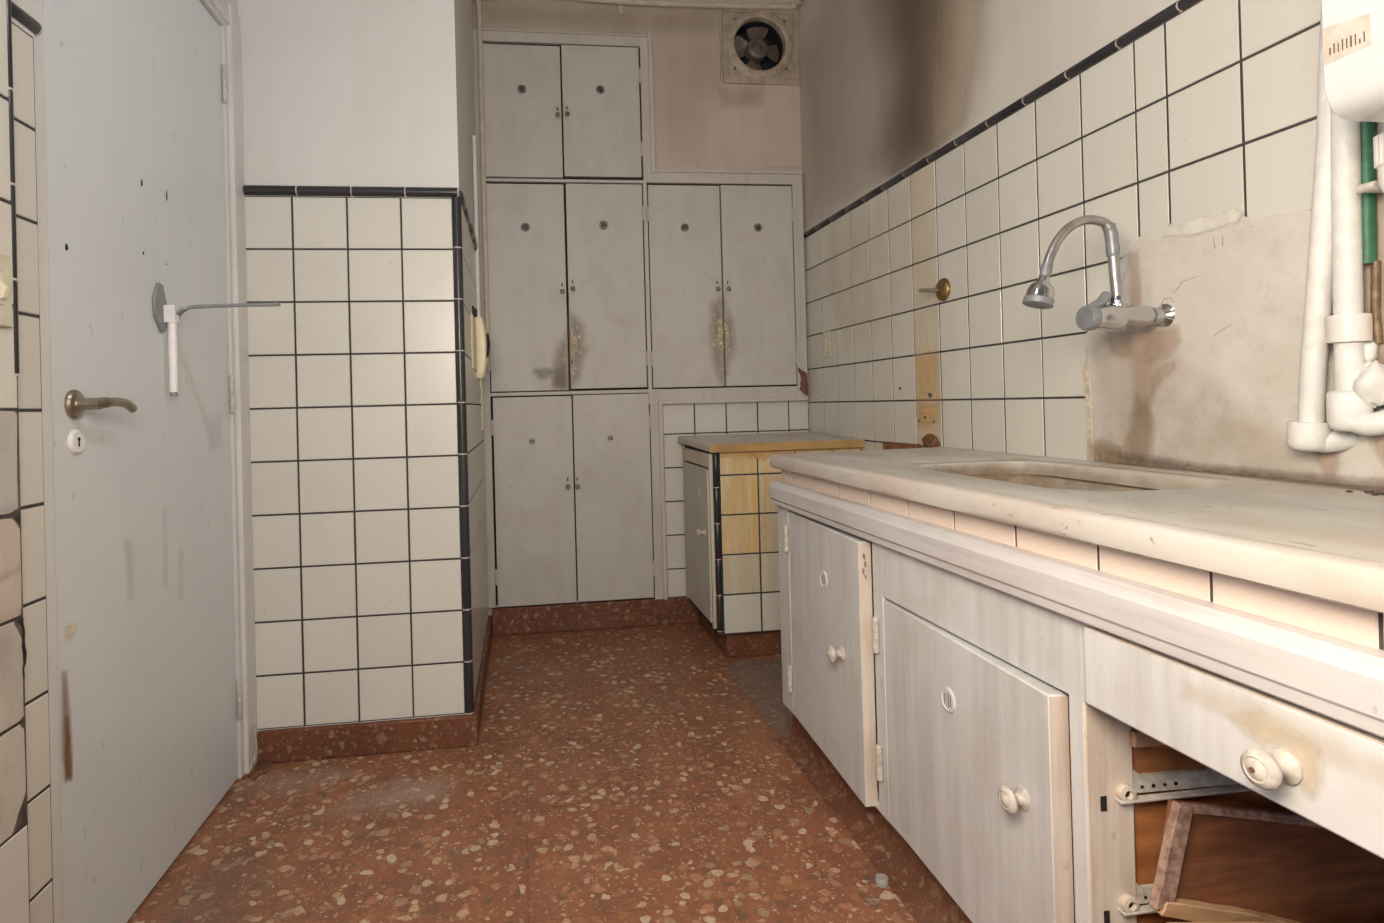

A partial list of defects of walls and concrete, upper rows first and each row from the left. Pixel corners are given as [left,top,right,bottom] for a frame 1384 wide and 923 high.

peeling [1083,210,1384,487]
peeling [1363,169,1384,364]
crack [20,618,28,678]